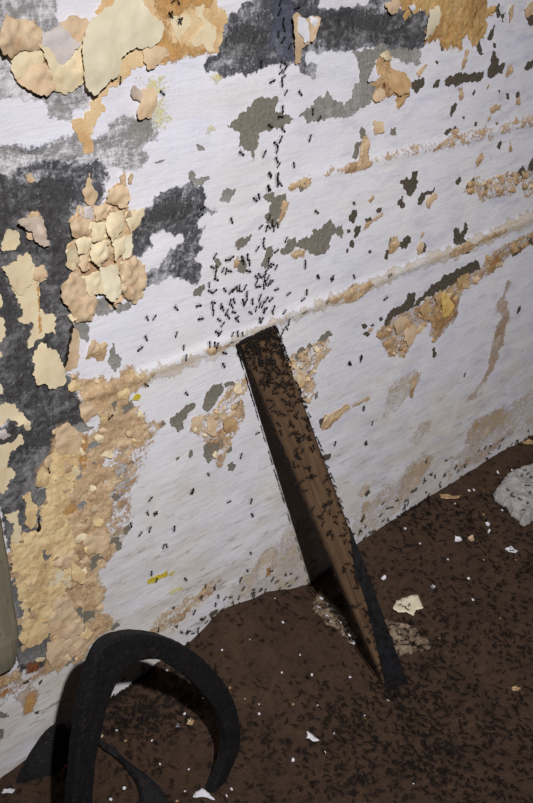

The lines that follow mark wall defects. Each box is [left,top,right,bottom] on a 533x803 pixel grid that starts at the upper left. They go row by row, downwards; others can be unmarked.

damp [220,0,296,62]
damp [314,7,424,48]
peeling [0,0,228,154]
peeling [227,3,514,161]
peeling [488,90,521,125]
damp [4,144,110,220]
peeling [345,120,396,173]
peeling [455,152,533,202]
damp [133,197,196,245]
peeling [361,223,533,358]
peeling [289,331,333,404]
peeling [0,170,252,675]